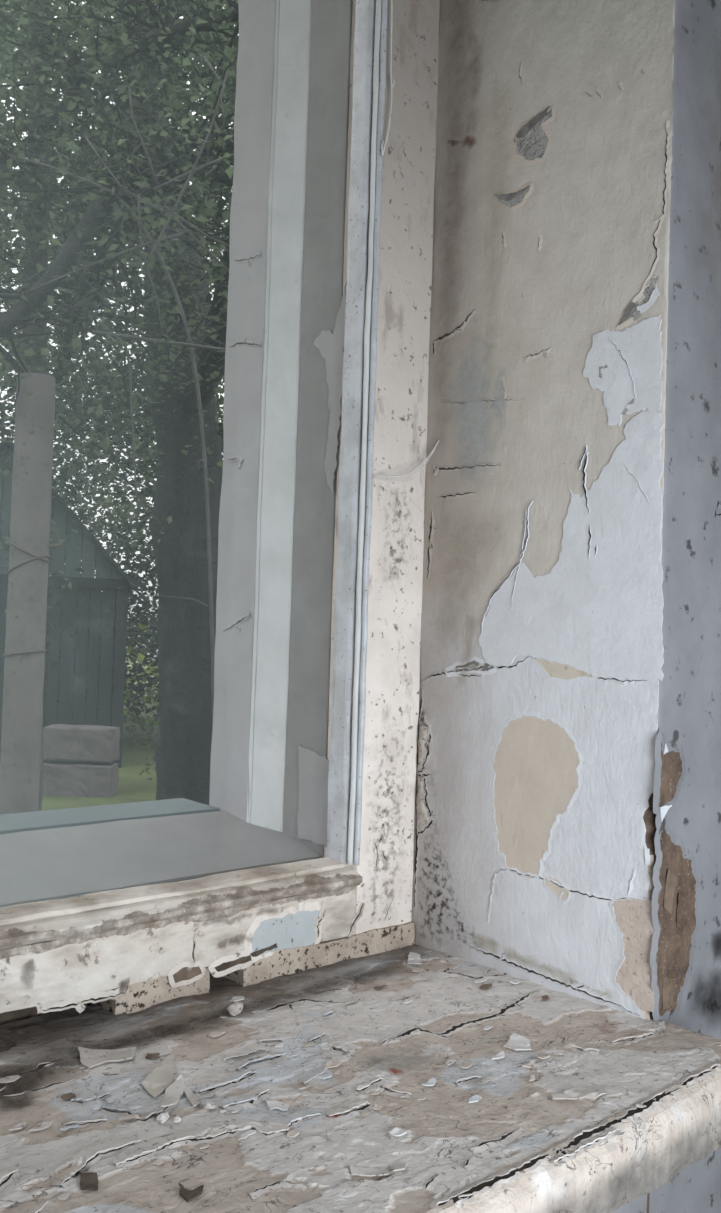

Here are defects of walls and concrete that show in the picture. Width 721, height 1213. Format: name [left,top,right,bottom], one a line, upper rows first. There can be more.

peeling [445,273,664,683]
crack [578,445,597,558]
spalling [0,1003,91,1025]
peeling [168,901,325,988]
peeling [296,744,329,848]
crack [307,501,541,946]
crack [249,847,650,1046]
peeling [490,710,583,905]
crack [593,676,650,686]
flaking render [563,729,700,1056]
peeling [6,1033,494,1213]
peeling [550,1128,625,1165]